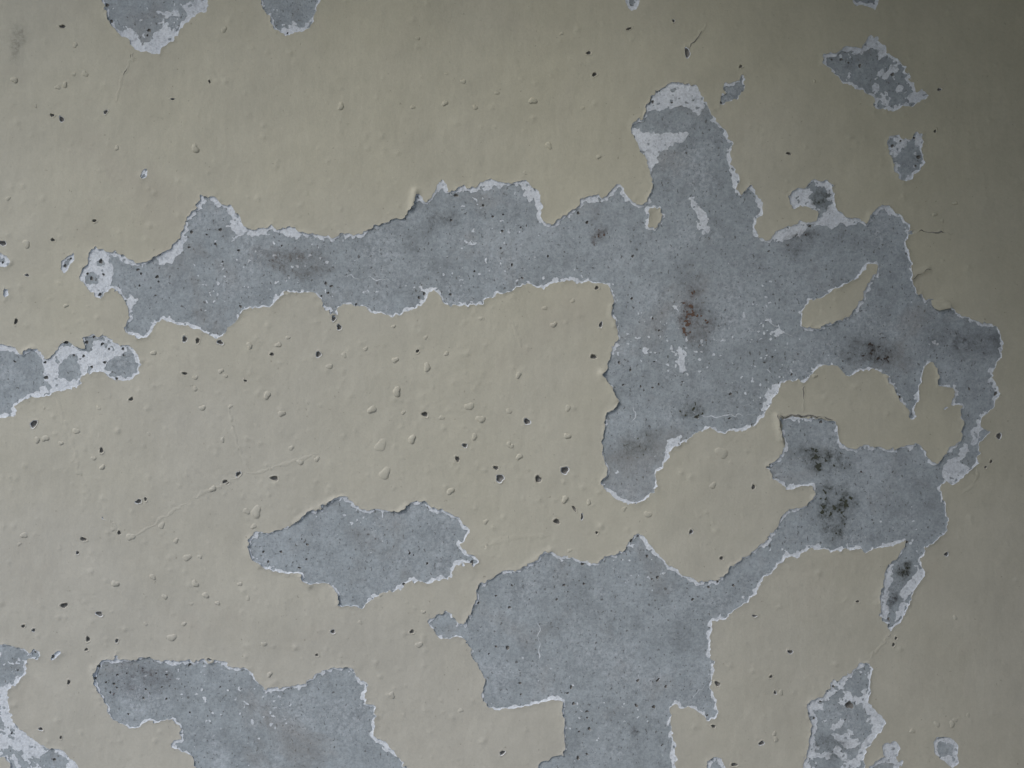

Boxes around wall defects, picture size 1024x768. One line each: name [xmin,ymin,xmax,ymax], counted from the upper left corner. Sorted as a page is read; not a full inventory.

peeling [102,0,209,54]
peeling [261,0,321,36]
peeling [822,35,944,112]
peeling [887,127,938,181]
peeling [0,334,141,418]
peeling [491,464,506,485]
peeling [248,496,479,609]
peeling [0,644,79,768]
peeling [93,637,407,768]
peeling [707,757,740,768]
peeling [803,663,903,768]
peeling [934,737,959,768]